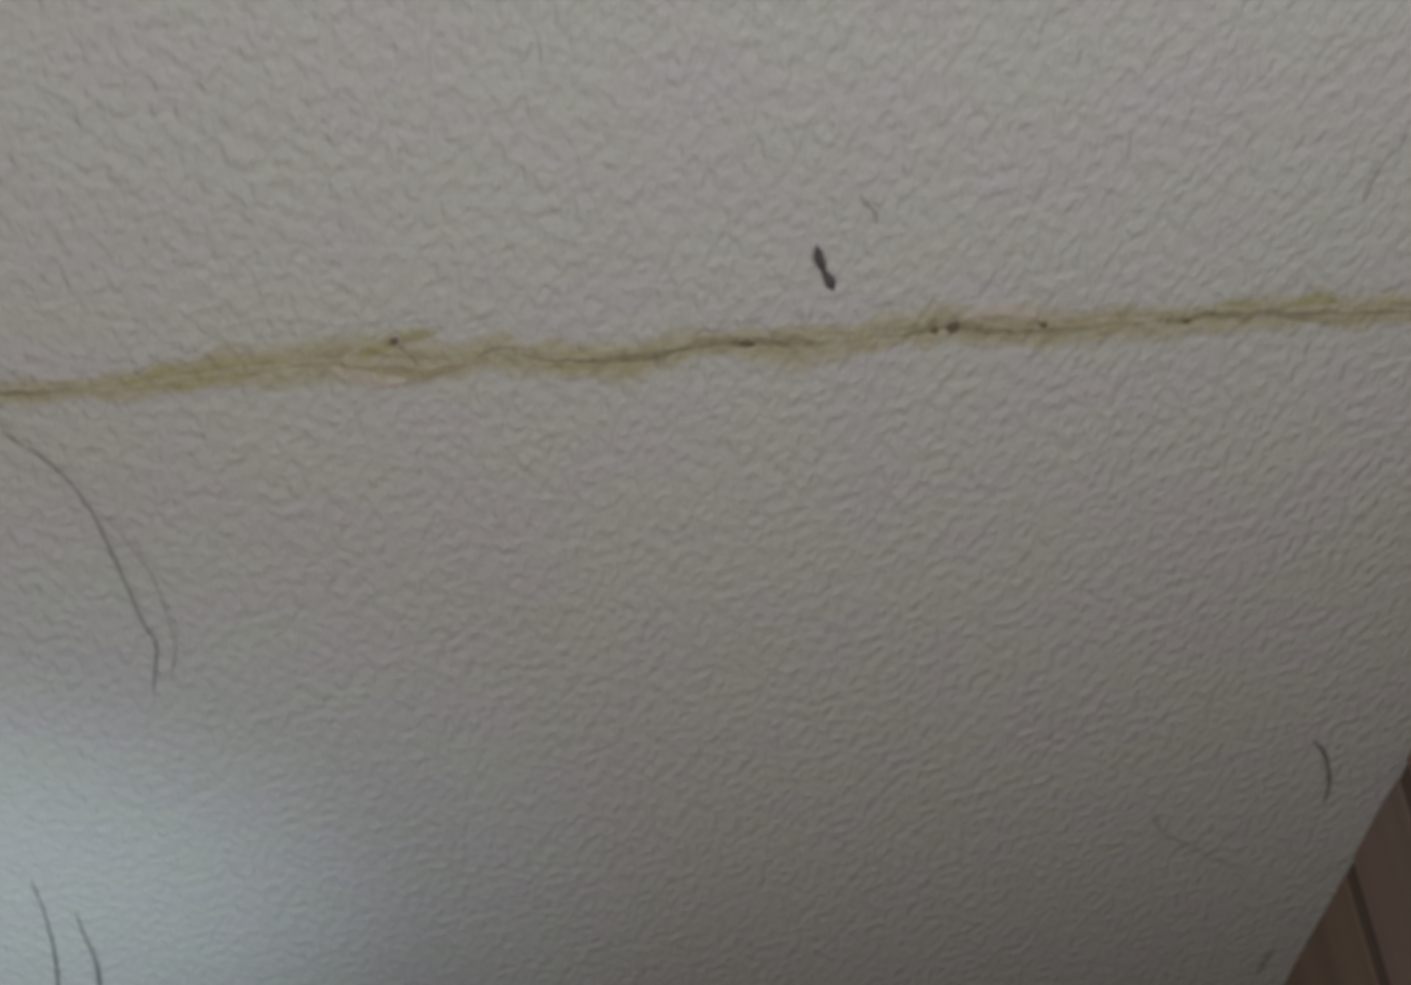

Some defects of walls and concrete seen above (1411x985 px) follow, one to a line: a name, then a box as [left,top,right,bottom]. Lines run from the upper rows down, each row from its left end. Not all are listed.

leakage [0,275,1411,414]
crack [0,304,1411,707]